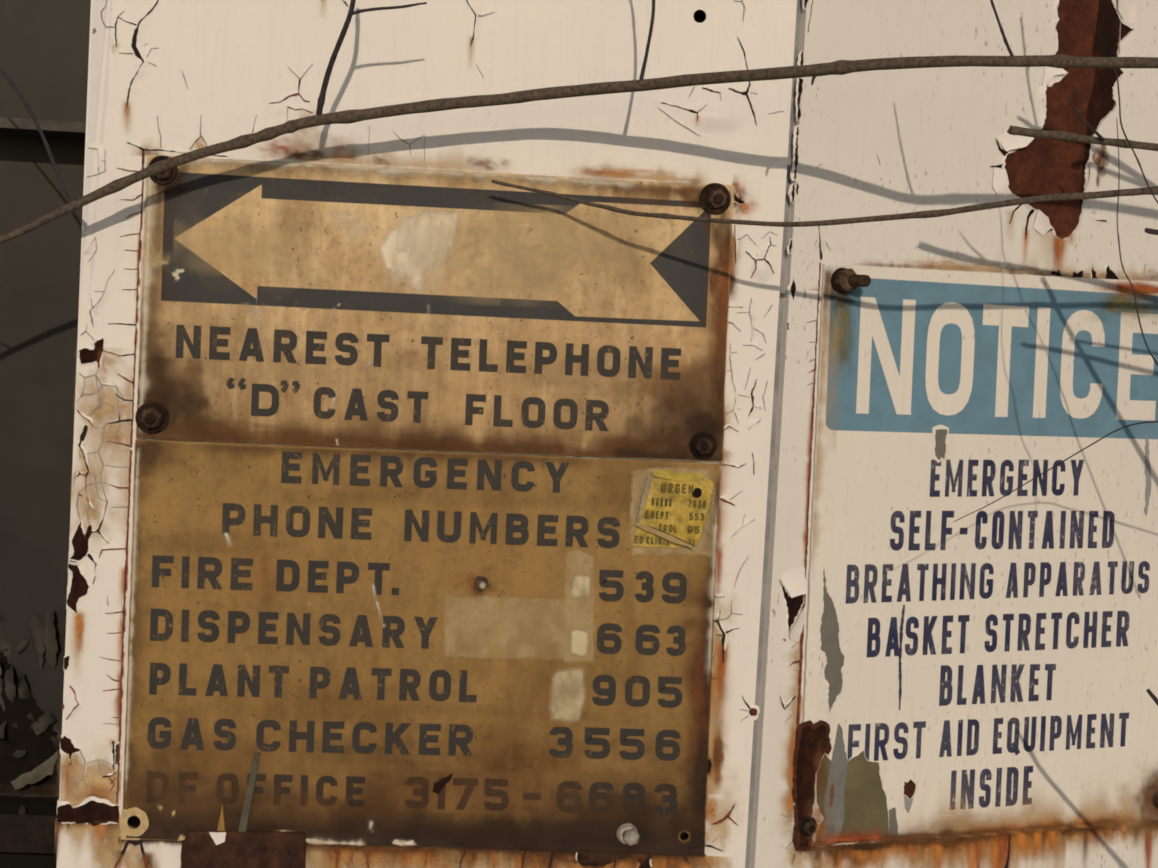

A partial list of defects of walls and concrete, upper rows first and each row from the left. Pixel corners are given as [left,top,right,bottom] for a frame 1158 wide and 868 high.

crack [101,0,188,109]
crack [252,64,314,133]
rust [592,169,702,208]
crack [658,0,784,136]
peeling [990,0,1137,241]
peeling [78,335,106,372]
crack [62,115,228,804]
rust [55,232,734,868]
crack [711,225,778,679]
crack [780,226,831,725]
peeling [0,517,121,826]
rust [792,781,1158,868]